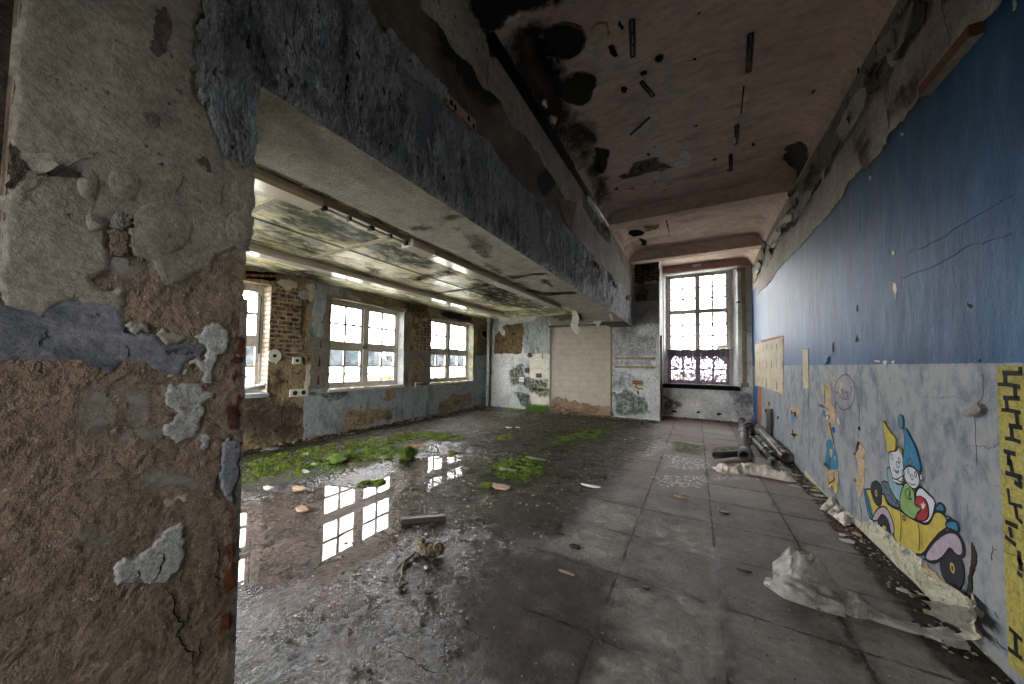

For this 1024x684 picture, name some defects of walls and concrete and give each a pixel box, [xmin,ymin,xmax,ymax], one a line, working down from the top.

water stain [467,0,611,205]
peeling [753,0,1017,295]
peeling [0,0,660,504]
water stain [254,201,433,268]
water stain [469,238,576,308]
crack [901,195,1012,279]
water stain [509,364,549,406]
water stain [614,329,655,416]
flaking render [853,426,866,499]
peeling [113,521,185,585]
flaking render [805,471,996,664]
crack [166,584,201,683]